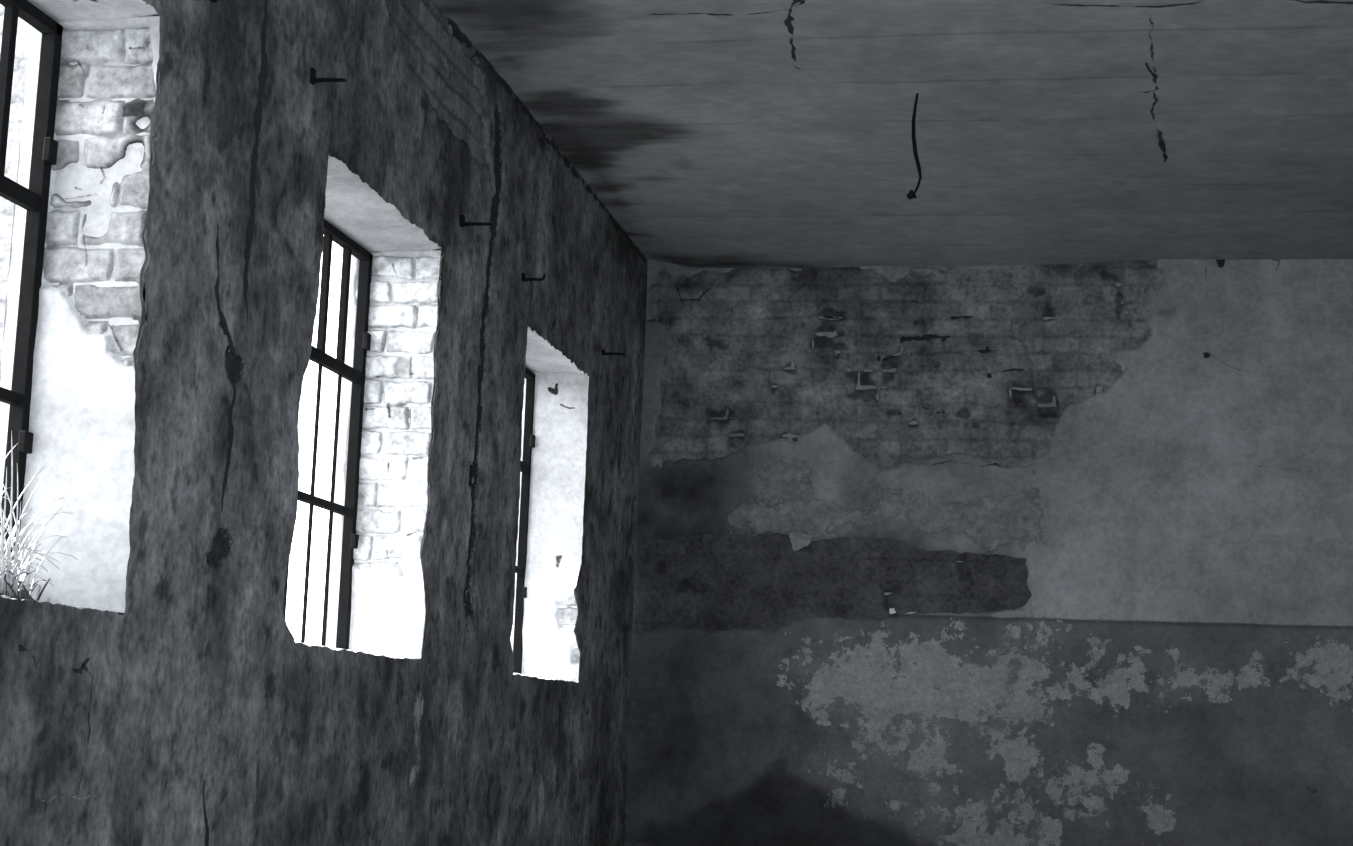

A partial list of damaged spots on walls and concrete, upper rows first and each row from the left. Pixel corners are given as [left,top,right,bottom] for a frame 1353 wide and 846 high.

flaking render [43,15,161,366]
damp [441,0,574,36]
damp [523,91,681,168]
crack [650,0,805,70]
crack [1054,2,1199,163]
flaking render [646,260,1165,470]
spalling [632,532,1353,846]